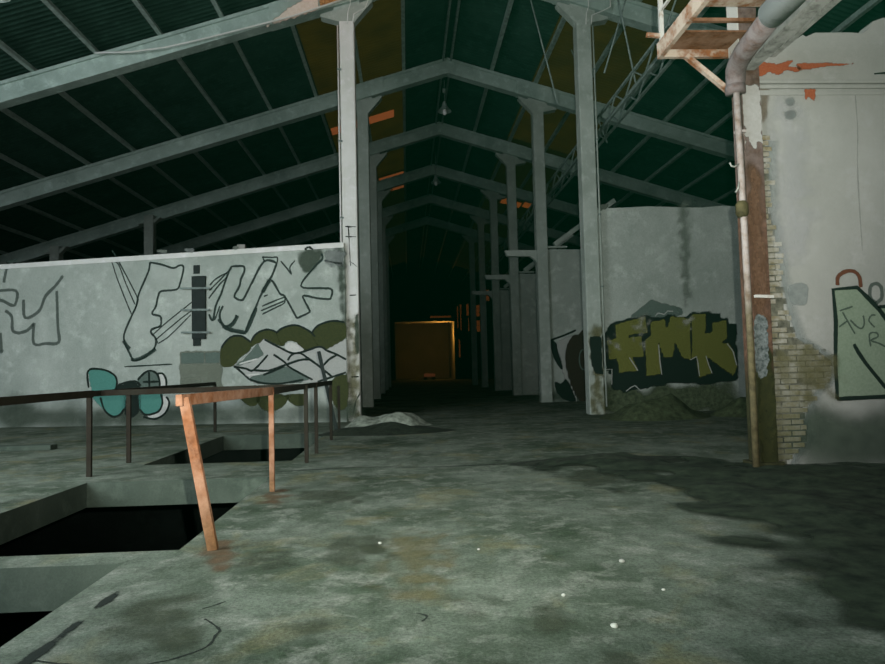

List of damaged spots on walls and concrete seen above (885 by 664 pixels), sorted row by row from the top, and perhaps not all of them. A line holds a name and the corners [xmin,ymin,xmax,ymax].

water stain [681,206,689,296]
corrosion [747,166,769,321]
flaking render [743,60,853,464]
water stain [299,248,361,419]
water stain [0,402,183,427]
water stain [192,403,269,424]
crack [148,601,226,664]